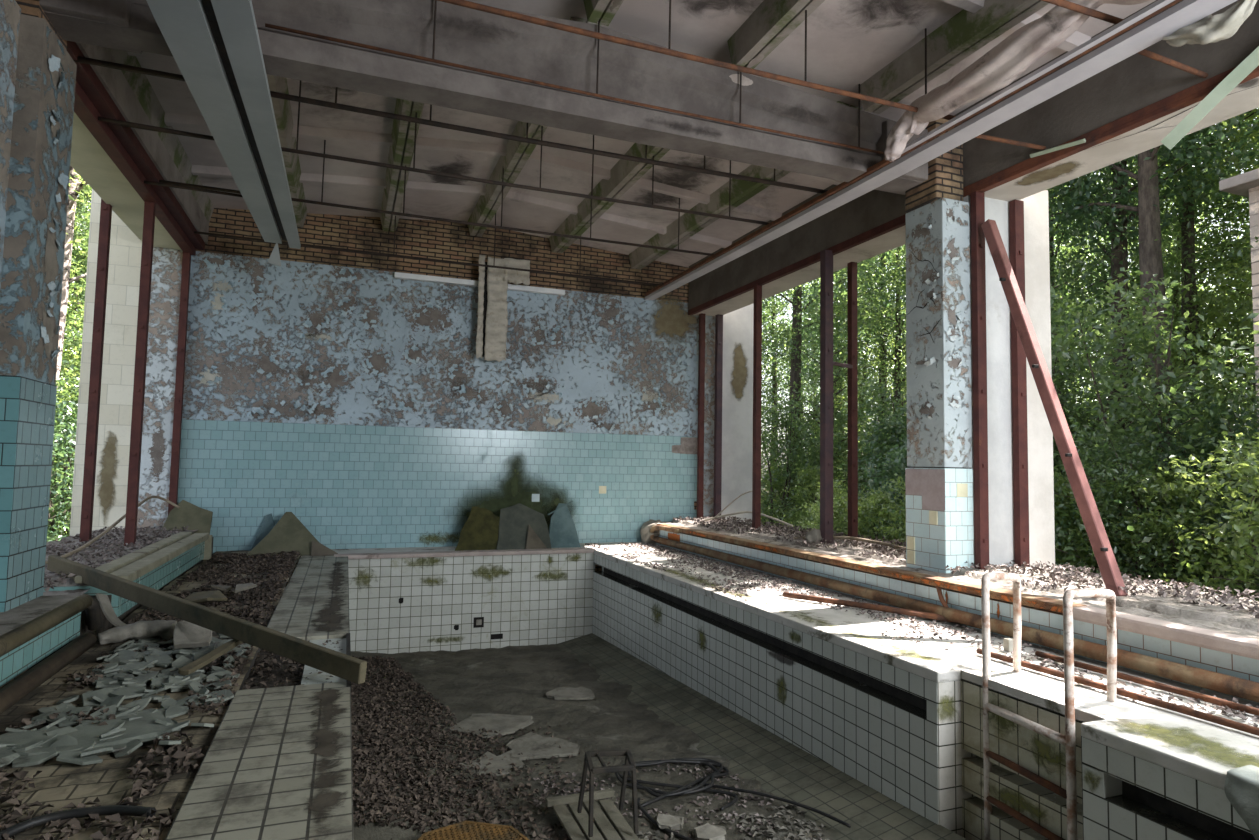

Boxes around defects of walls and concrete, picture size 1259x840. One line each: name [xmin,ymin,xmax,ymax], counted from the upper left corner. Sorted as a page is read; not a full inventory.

leakage [687,0,753,11]
leakage [861,0,917,20]
peeling [48,55,65,88]
leakage [432,164,466,185]
peeling [41,170,69,360]
peeling [914,208,962,369]
peeling [245,268,456,424]
peeling [441,316,623,433]
leakage [731,344,748,399]
peeling [917,395,961,420]
leakage [98,433,118,516]
peeling [148,421,166,482]